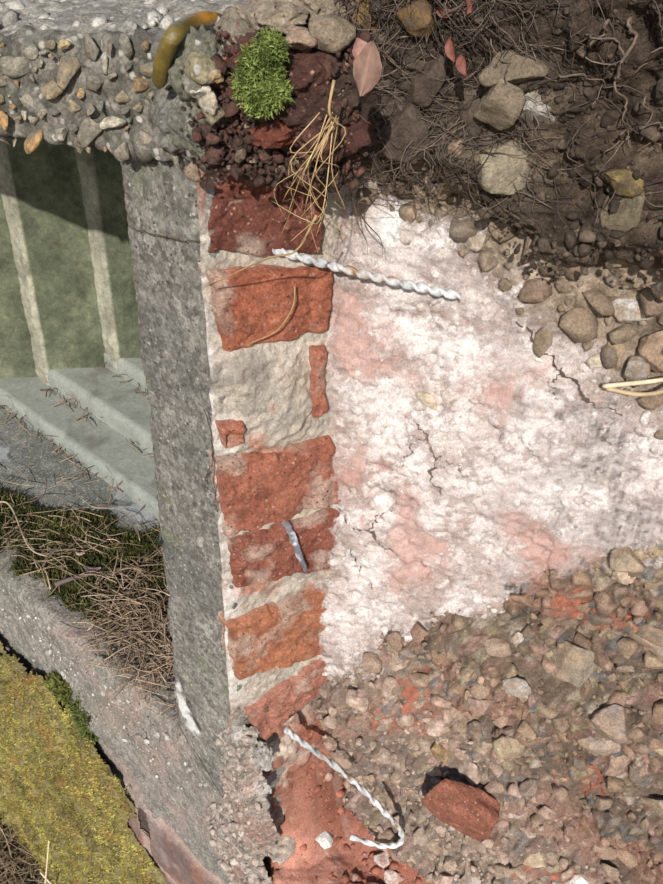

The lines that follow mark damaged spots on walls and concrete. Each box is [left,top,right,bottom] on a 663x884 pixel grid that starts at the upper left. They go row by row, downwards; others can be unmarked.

crack [516,321,622,416]
crack [402,420,465,496]
spalling [205,724,296,884]